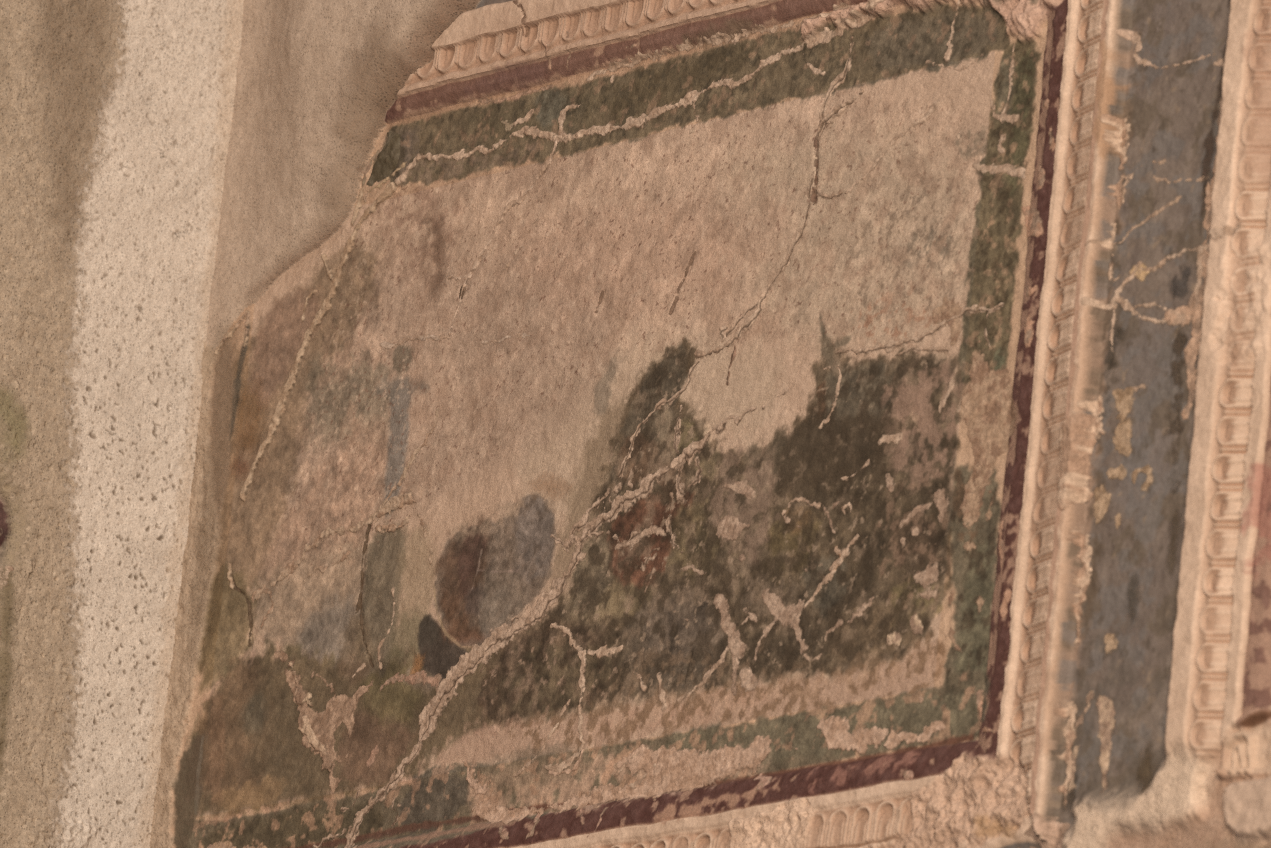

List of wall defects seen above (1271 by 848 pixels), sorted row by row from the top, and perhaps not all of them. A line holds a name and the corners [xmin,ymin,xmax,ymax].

crack [926,0,1026,179]
crack [227,0,940,848]
crack [818,302,1004,429]
peeling [1024,315,1035,347]
peeling [1021,204,1043,238]
peeling [1100,114,1131,281]
peeling [1181,106,1221,420]
peeling [1057,387,1153,645]
peeling [1104,634,1118,654]
peeling [464,735,772,840]
peeling [816,716,946,755]
spalling [858,690,1116,848]